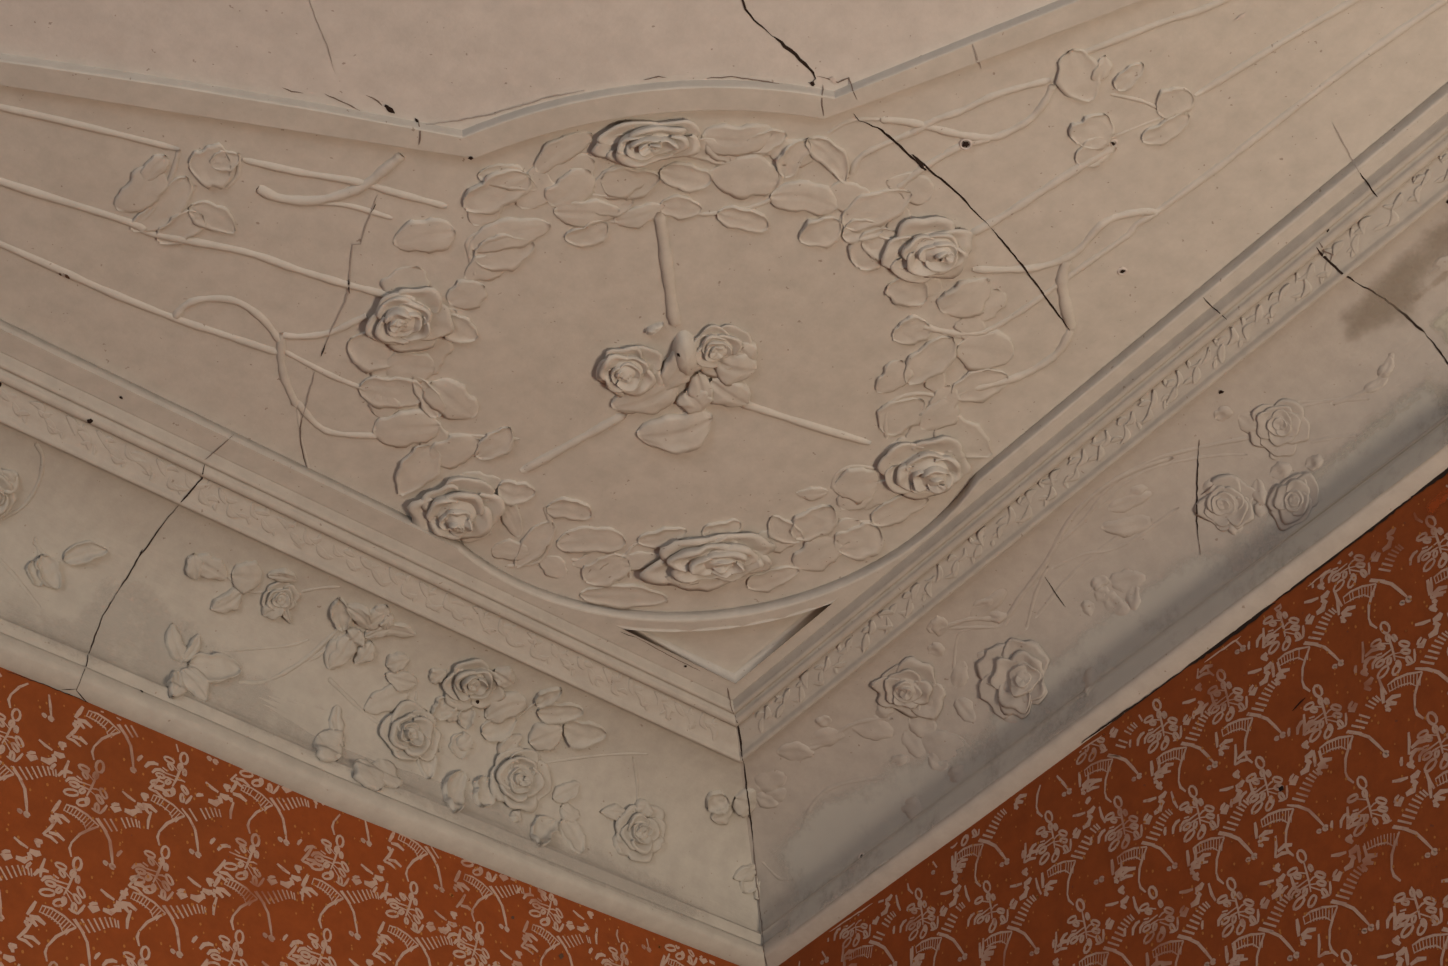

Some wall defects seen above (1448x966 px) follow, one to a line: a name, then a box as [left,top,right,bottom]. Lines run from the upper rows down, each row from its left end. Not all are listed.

crack [284,0,585,144]
crack [707,0,1070,330]
crack [1316,242,1448,364]
crack [5,436,232,703]
crack [1196,440,1214,554]
crack [1082,468,1448,743]